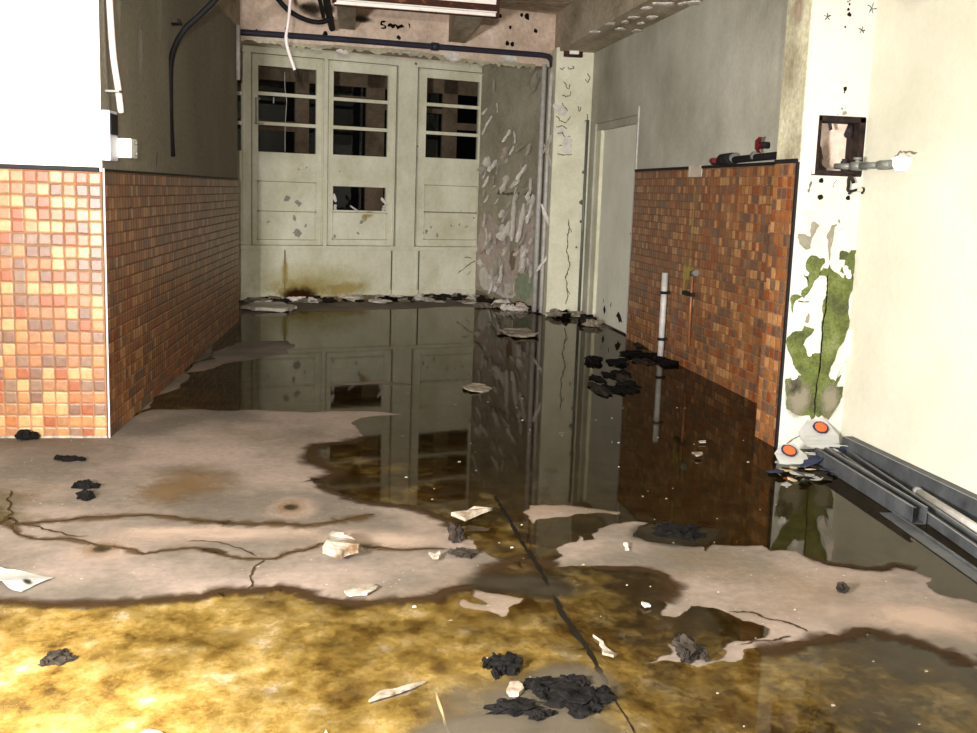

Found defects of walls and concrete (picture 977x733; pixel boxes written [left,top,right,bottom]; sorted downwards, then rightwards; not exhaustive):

leakage [589,0,702,33]
peeling [450,130,548,306]
rust [283,263,357,298]
crack [799,267,828,414]
peeling [785,219,856,420]
crack [0,490,374,588]
crack [362,544,446,552]